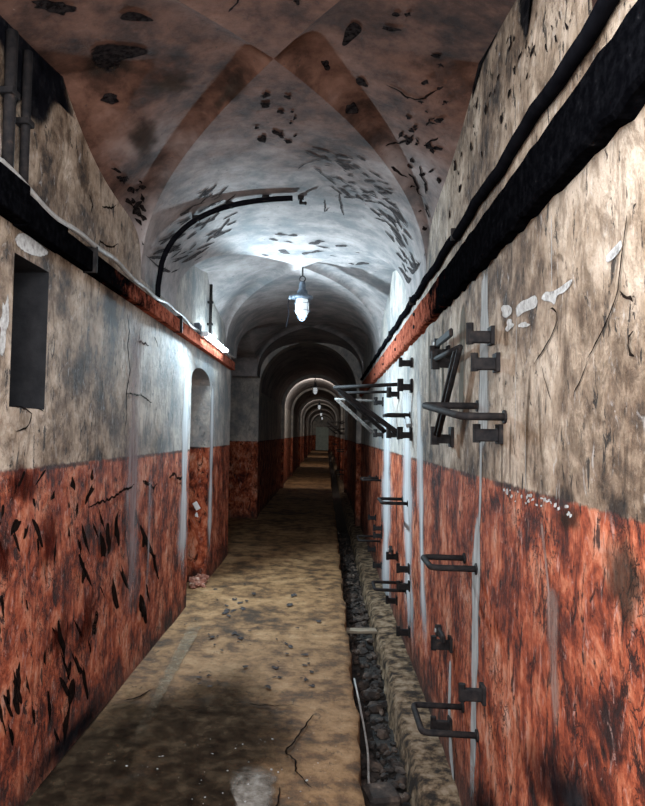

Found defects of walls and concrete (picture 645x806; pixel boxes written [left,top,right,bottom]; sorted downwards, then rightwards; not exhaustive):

spalling [32,0,77,15]
spalling [120,12,153,22]
spalling [342,22,361,46]
spalling [91,44,148,72]
spalling [101,93,119,104]
spalling [606,241,622,262]
spalling [501,279,572,332]
crack [573,215,633,397]
crack [534,307,557,399]
crack [90,472,183,507]
crack [285,715,313,787]